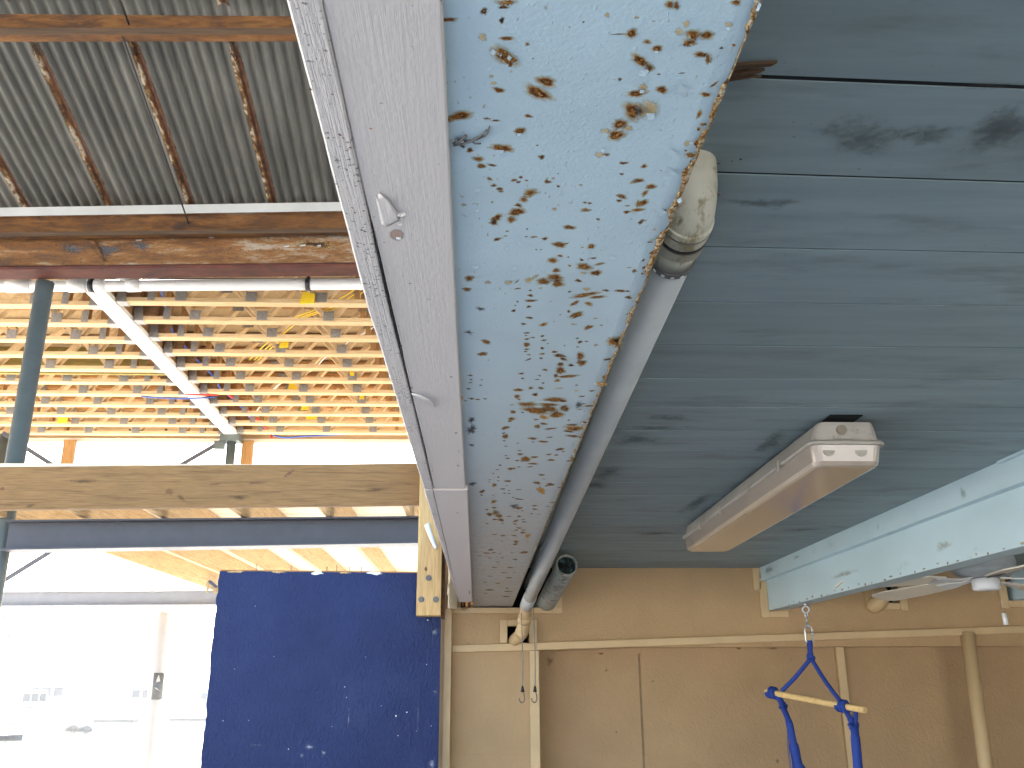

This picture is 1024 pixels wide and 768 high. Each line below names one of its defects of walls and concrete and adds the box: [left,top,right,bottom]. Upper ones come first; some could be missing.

rust [31,44,114,206]
rust [128,42,195,205]
rust [229,43,277,203]
rust [448,111,471,122]
rust [467,0,762,606]